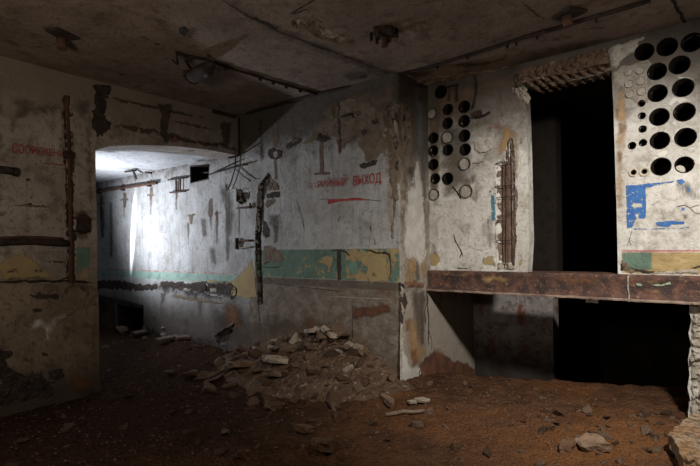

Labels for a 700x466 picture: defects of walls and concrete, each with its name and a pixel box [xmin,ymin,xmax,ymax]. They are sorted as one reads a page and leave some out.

spalling [91,84,112,137]
spalling [512,76,531,105]
spalling [483,138,523,270]
spalling [29,99,440,381]
rust [353,305,390,319]
rust [405,280,475,376]
spalling [0,349,65,407]